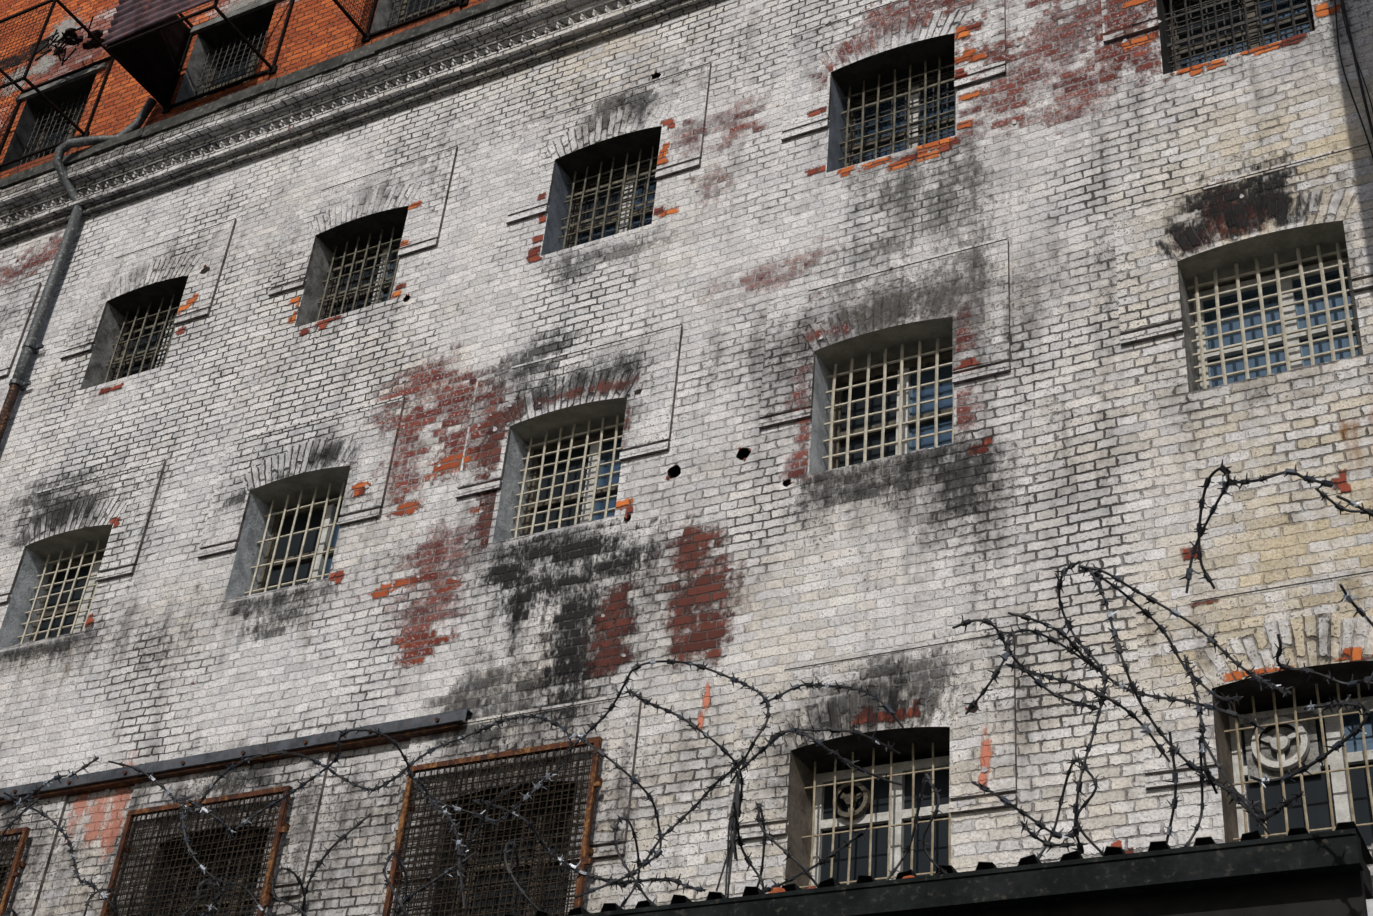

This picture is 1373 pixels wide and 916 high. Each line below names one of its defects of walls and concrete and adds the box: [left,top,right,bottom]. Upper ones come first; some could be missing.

peeling [805,0,1310,177]
peeling [0,235,63,289]
peeling [952,308,982,427]
peeling [779,365,811,483]
peeling [352,343,642,677]
leakage [801,435,998,519]
spalling [1332,469,1352,492]
spalling [328,570,344,584]
peeling [656,515,749,669]
leakage [418,649,587,748]
spalling [1334,647,1373,661]
peeling [978,728,992,786]